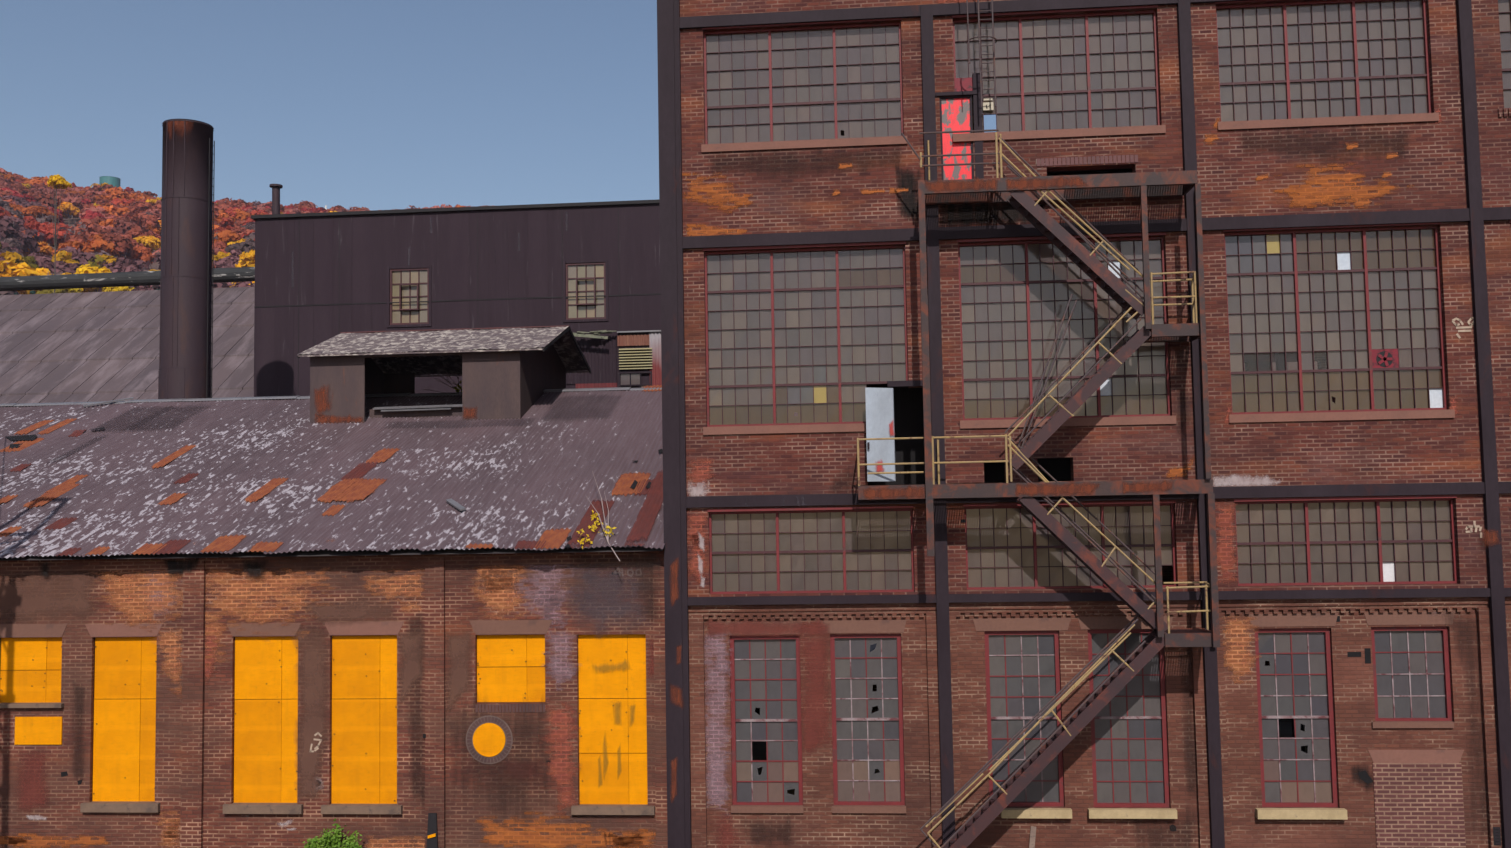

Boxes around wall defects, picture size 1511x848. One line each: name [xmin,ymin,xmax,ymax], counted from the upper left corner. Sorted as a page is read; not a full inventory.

spalling [682,173,753,236]
spalling [1256,144,1398,208]
corrosion [0,475,88,508]
corrosion [45,517,77,530]
corrosion [152,445,196,469]
corrosion [157,473,198,505]
corrosion [318,448,399,516]
corrosion [515,472,654,549]
spalling [477,703,656,848]